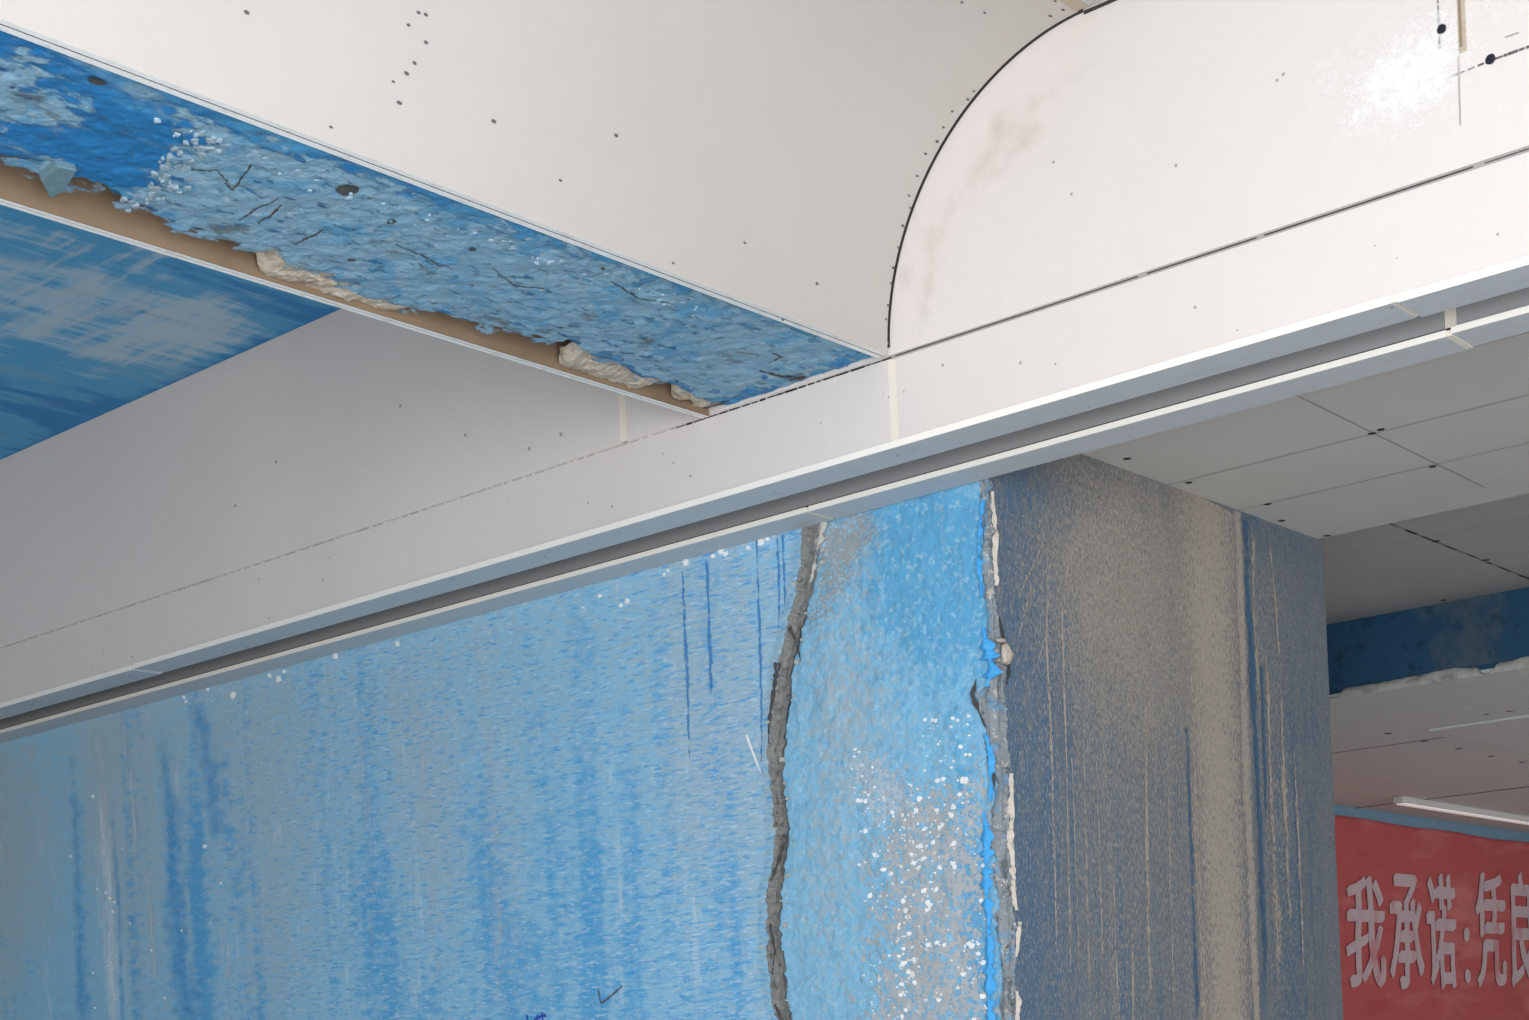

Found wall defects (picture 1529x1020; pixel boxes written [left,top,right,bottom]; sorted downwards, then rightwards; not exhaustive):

peeling [0,46,107,136]
peeling [0,89,867,401]
crack [759,522,827,1020]
peeling [840,478,1022,1020]